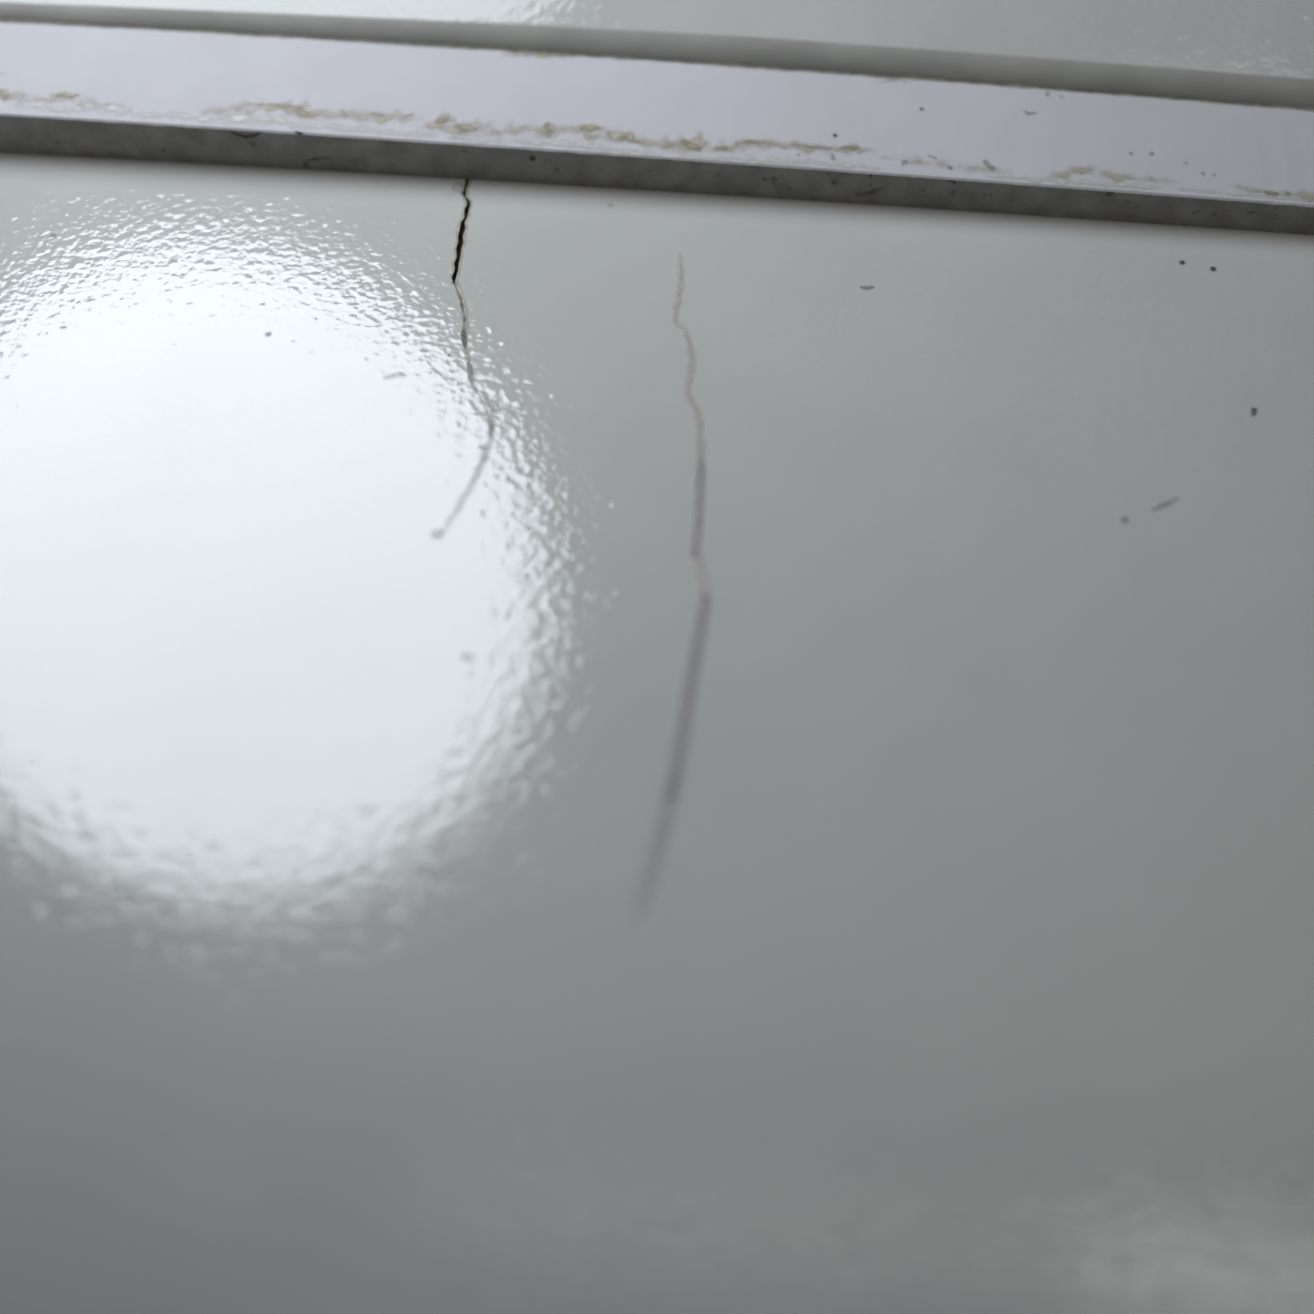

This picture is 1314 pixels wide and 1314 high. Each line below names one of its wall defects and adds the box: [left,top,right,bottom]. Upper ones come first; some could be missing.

crack [452,179,473,381]
crack [670,275,709,782]